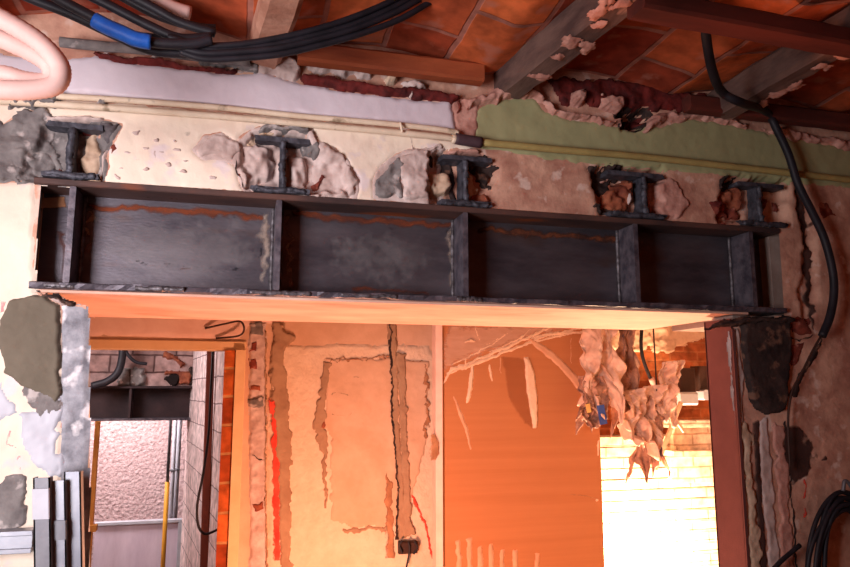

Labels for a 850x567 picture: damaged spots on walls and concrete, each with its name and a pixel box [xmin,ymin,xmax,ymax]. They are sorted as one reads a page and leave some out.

flaking render [93,51,747,133]
spalling [0,107,131,185]
flaking render [143,124,360,199]
flaking render [372,138,451,205]
flaking render [587,163,633,215]
flaking render [647,177,690,221]
rust [85,203,269,275]
rust [285,211,451,284]
crack [789,189,836,397]
flaking render [633,326,705,354]
flaking render [726,328,798,567]
leakage [783,427,813,518]